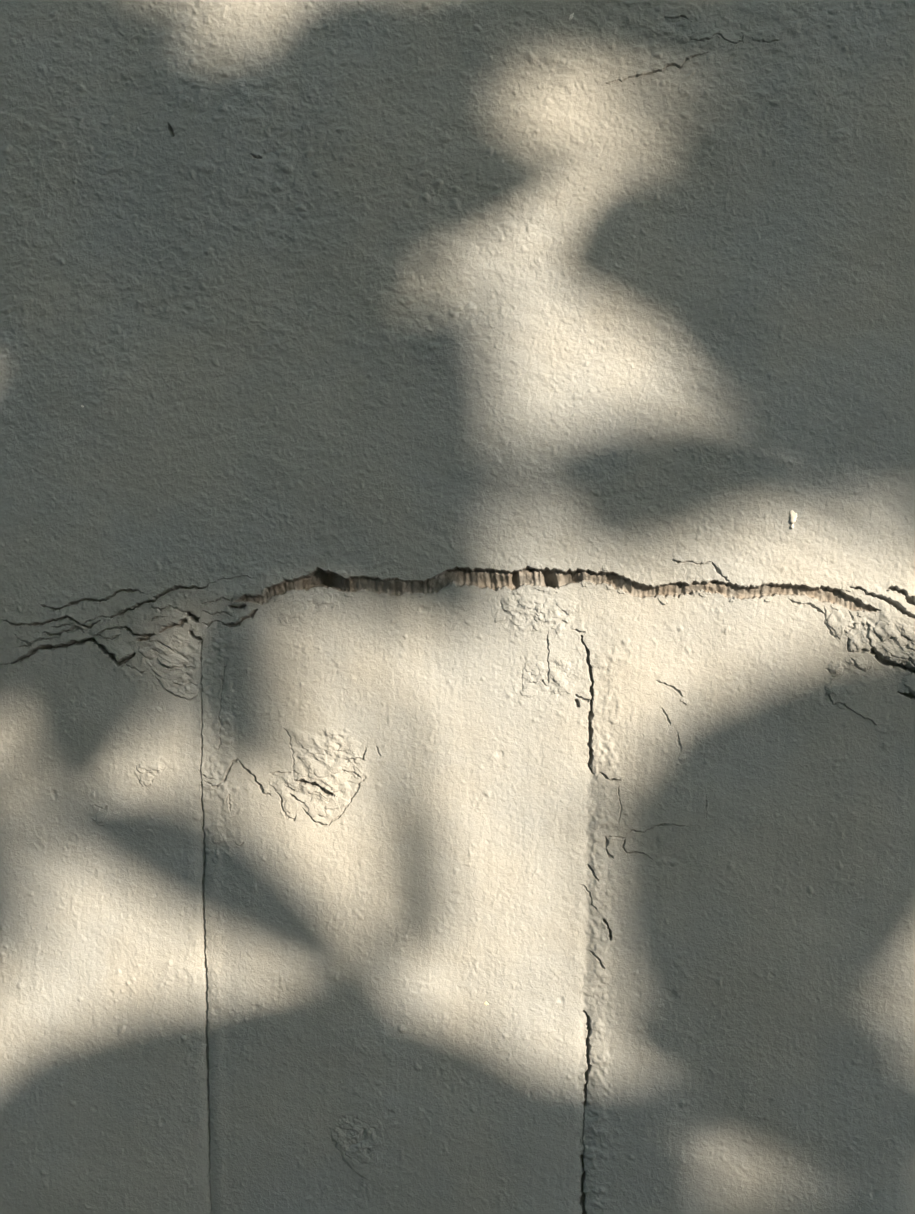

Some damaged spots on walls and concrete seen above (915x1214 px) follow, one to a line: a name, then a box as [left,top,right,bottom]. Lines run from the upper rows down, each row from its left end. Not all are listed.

crack [602,14,784,86]
spalling [133,630,202,702]
spalling [823,604,915,727]
spalling [237,725,382,828]
crack [0,558,915,1214]